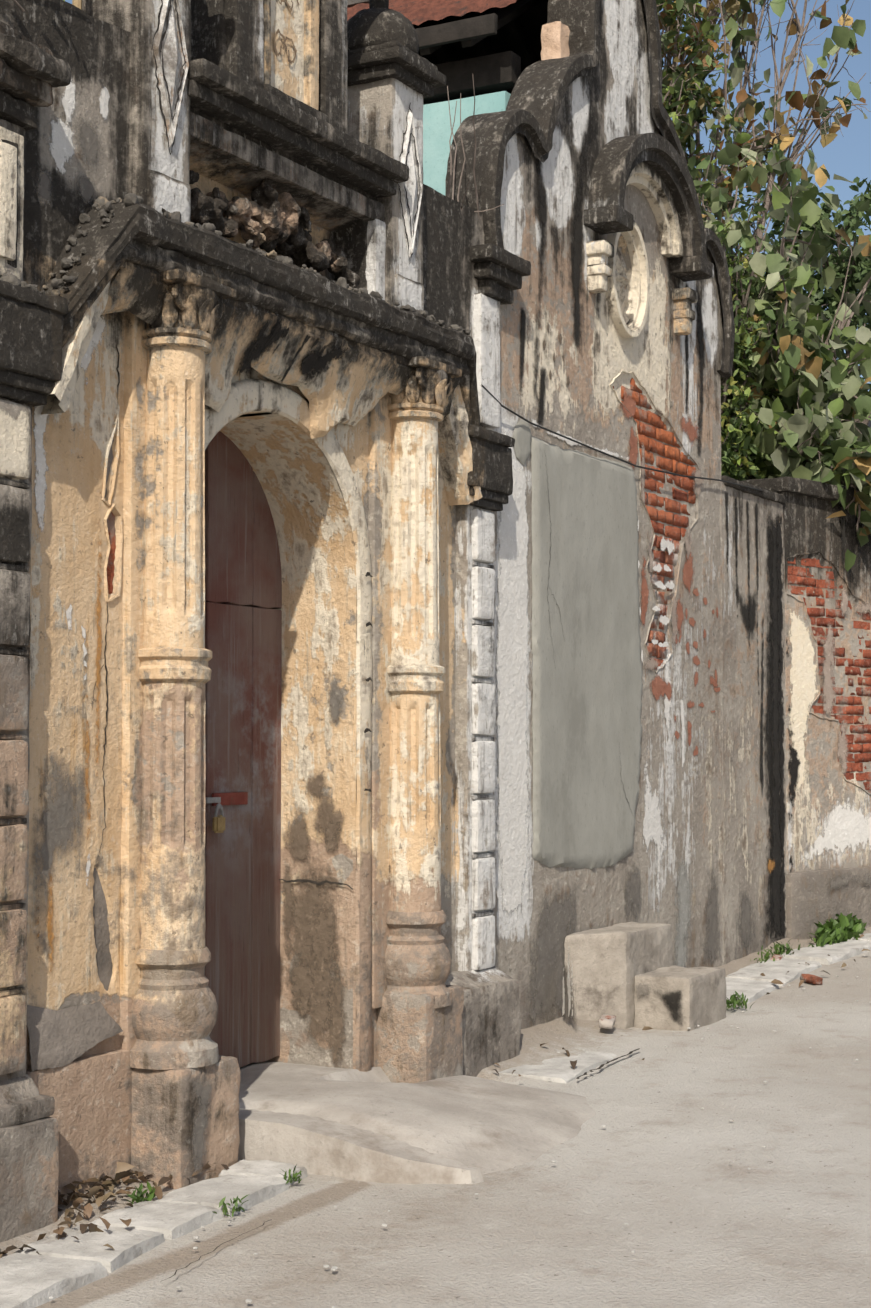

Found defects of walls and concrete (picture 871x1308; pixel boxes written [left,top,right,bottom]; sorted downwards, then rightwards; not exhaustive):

water stain [571,112,594,347]
peeling [496,466,530,914]
flaking render [532,370,721,767]
peeling [643,749,667,911]
water stain [705,872,720,963]
water stain [725,492,801,951]
flaking render [786,551,871,864]